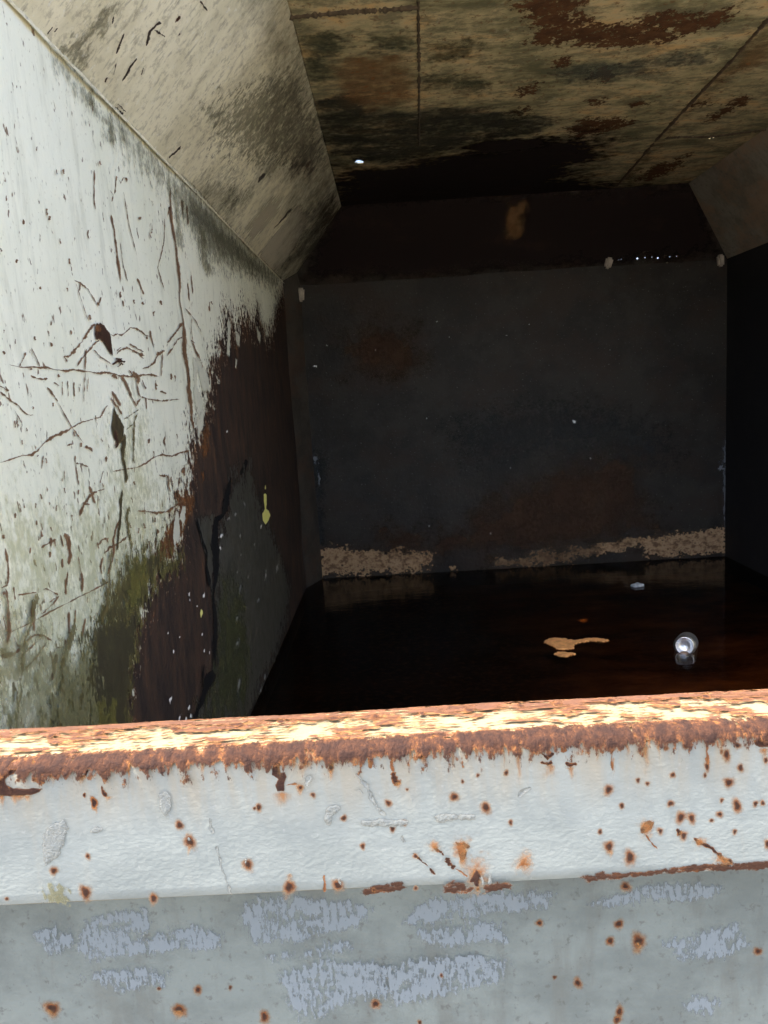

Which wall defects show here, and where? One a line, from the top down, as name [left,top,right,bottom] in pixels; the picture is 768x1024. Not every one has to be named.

rust [508,0,743,68]
water stain [201,32,718,281]
crack [192,451,292,721]
water stain [15,594,40,721]
water stain [58,620,77,727]
water stain [90,549,148,726]
rust [0,769,41,802]
rust [272,758,334,801]
rust [704,741,765,822]
rust [362,882,418,895]
rust [431,842,512,894]
rust [580,801,768,890]